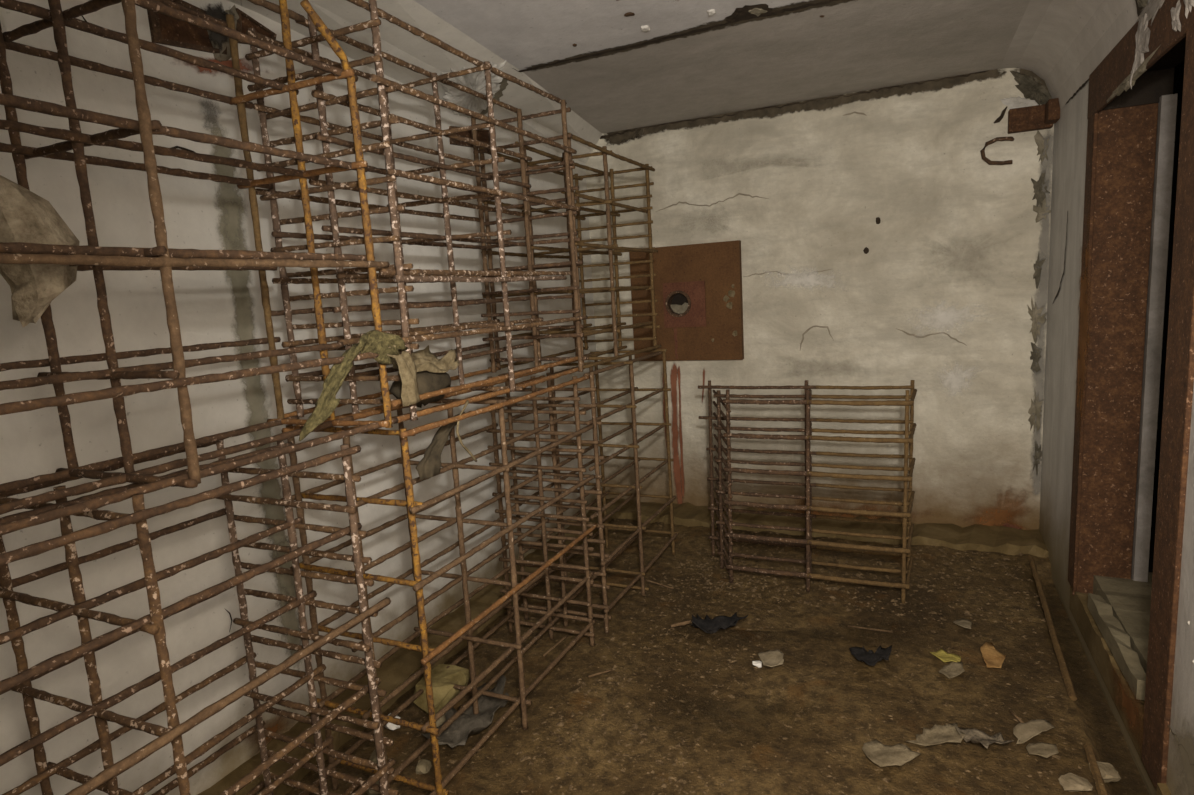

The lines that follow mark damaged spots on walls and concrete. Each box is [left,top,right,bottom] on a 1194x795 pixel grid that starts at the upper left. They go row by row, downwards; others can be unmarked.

damp [204,4,235,21]
spalling [725,4,785,22]
spalling [1000,68,1052,109]
peeling [1107,0,1194,103]
peeling [1027,130,1054,494]
rust [1076,244,1090,427]
rust [663,364,685,504]